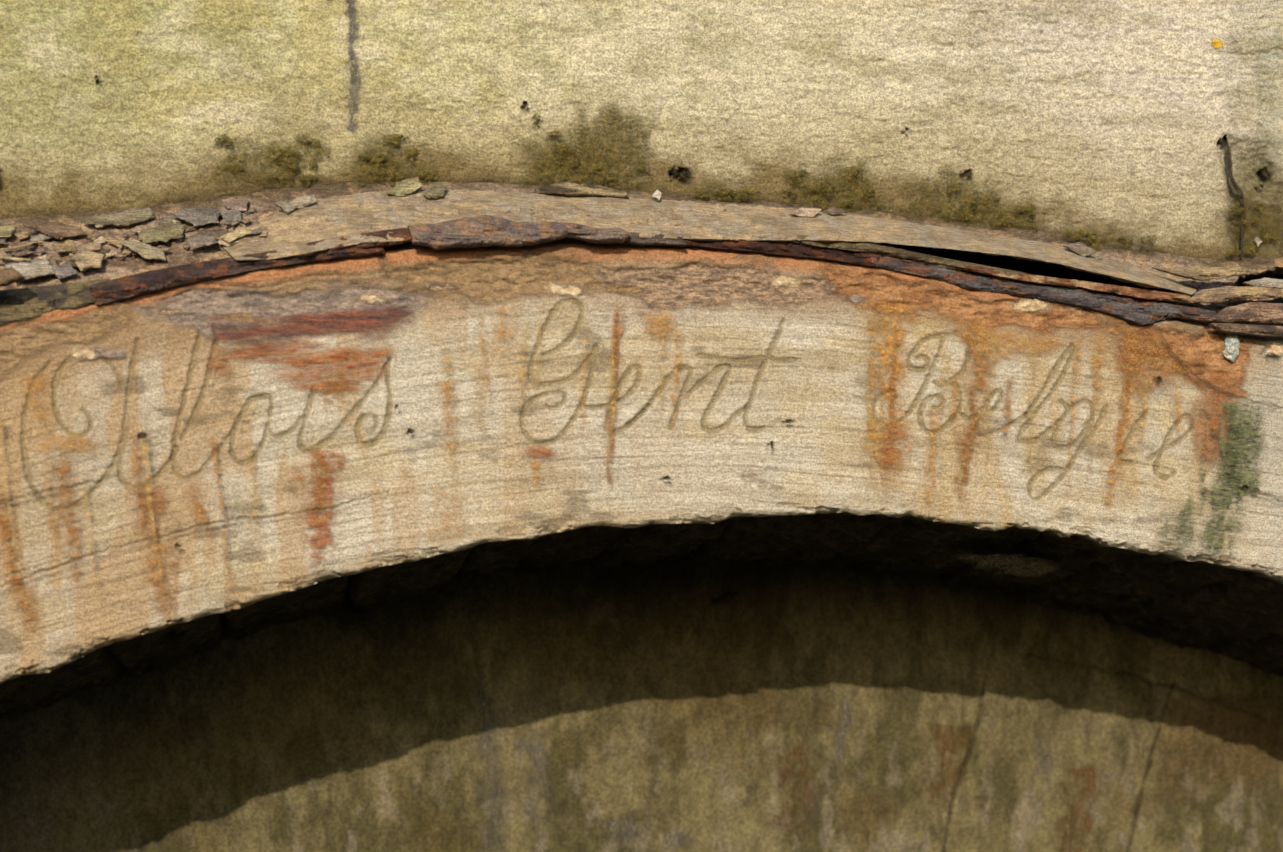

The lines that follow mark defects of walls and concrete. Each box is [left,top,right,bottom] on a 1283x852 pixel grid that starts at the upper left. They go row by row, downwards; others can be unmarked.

spalling [0,198,253,280]
corrosion [209,306,410,402]
spalling [387,177,447,200]
spalling [0,253,1251,398]
corrosion [865,303,913,476]
corrosion [927,322,1056,502]
corrosion [963,264,1193,304]
corrosion [1106,330,1235,503]
crack [1224,135,1245,257]
water stain [1235,147,1283,257]
spalling [1266,343,1283,355]
corrosion [299,450,345,561]